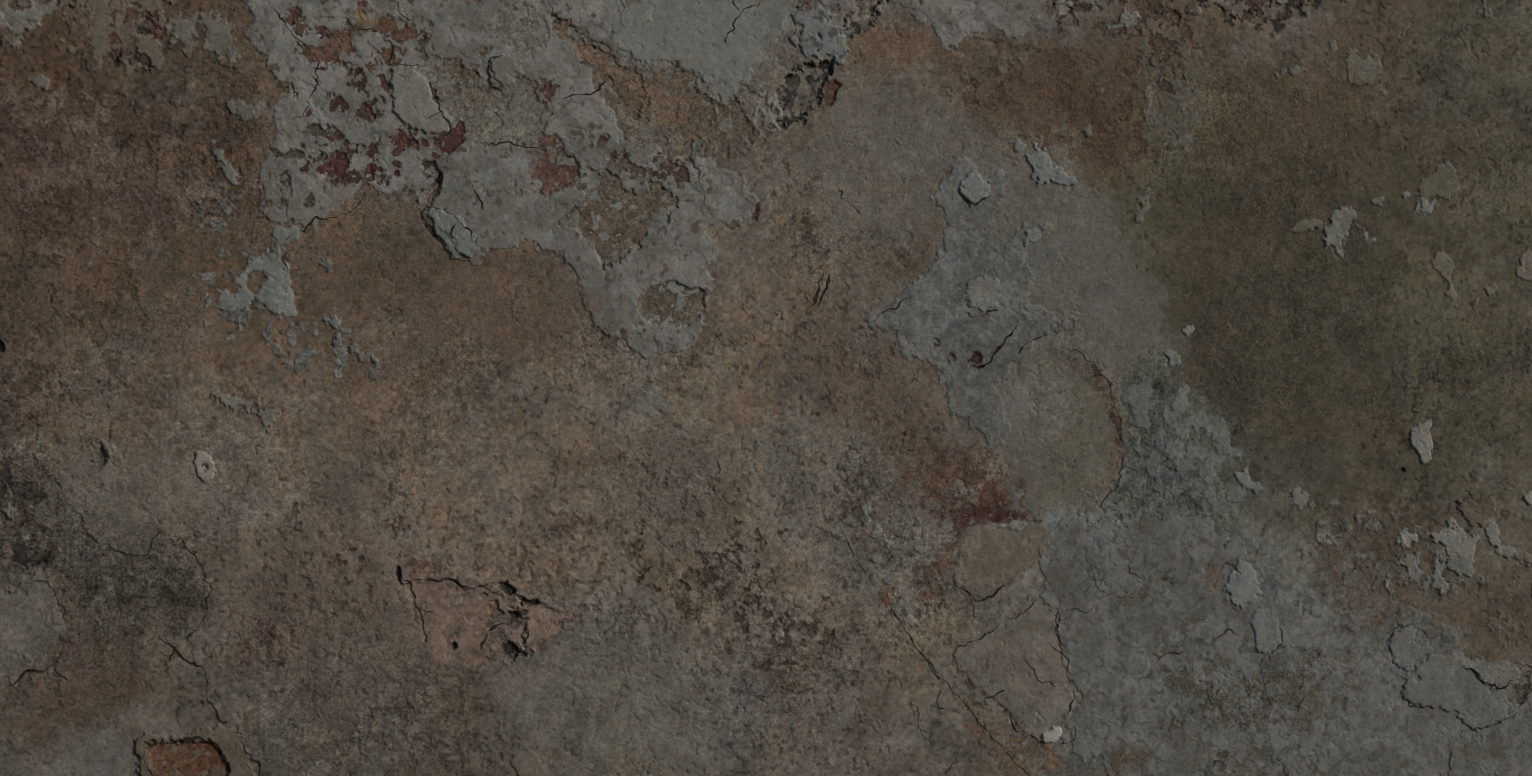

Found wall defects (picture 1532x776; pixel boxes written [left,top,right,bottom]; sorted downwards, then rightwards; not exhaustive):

peeling [0,0,1313,409]
crack [966,309,1125,504]
peeling [824,136,1532,776]
crack [0,580,69,691]
crack [78,512,261,776]
peeling [132,722,263,776]
spalling [394,565,577,667]
crack [838,524,1146,775]
crack [1138,624,1284,697]
crack [1387,623,1532,776]